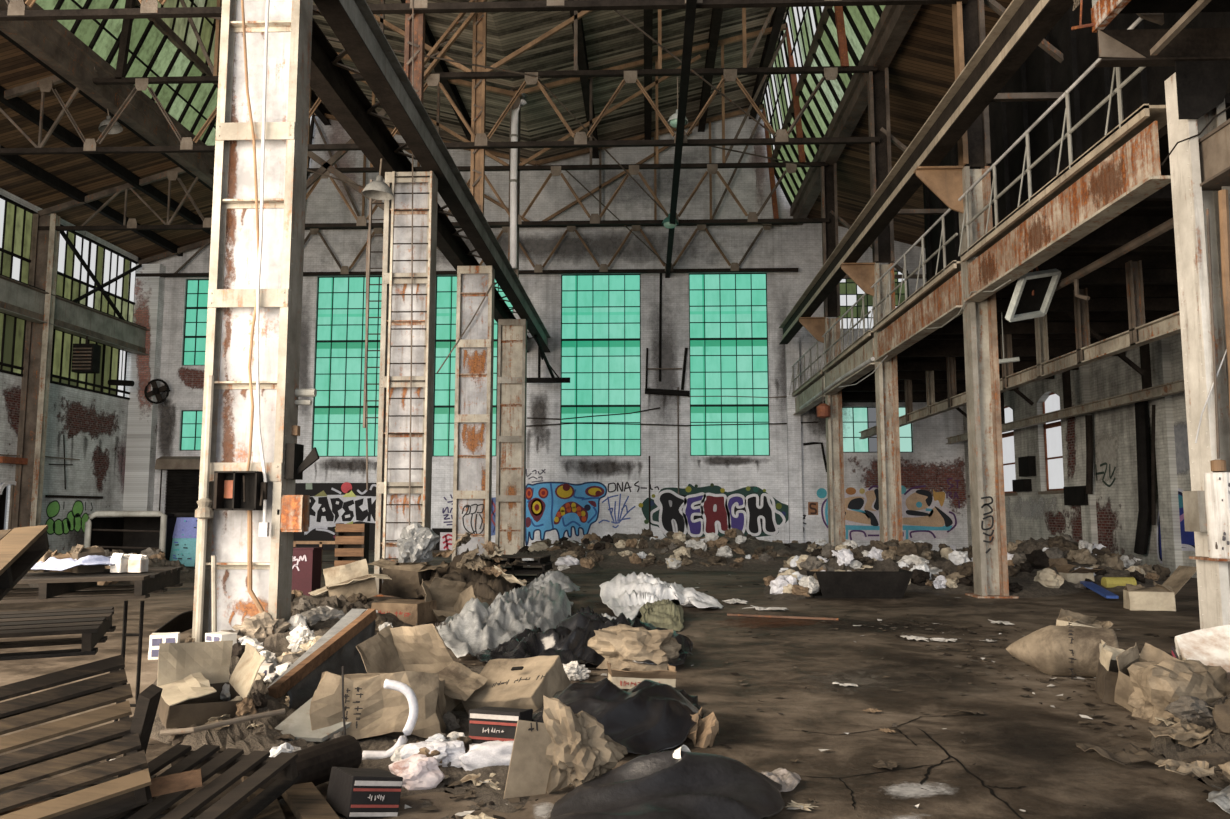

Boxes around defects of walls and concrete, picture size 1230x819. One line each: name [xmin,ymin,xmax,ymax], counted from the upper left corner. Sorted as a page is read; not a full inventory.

rust [1088,159,1126,208]
rust [223,140,246,289]
rust [1023,215,1051,255]
rust [979,251,997,283]
rust [221,307,247,463]
rust [463,350,486,374]
flaking render [54,396,119,492]
rust [462,424,484,454]
flaking render [848,457,878,489]
flaking render [900,457,967,513]
crack [787,715,1026,819]